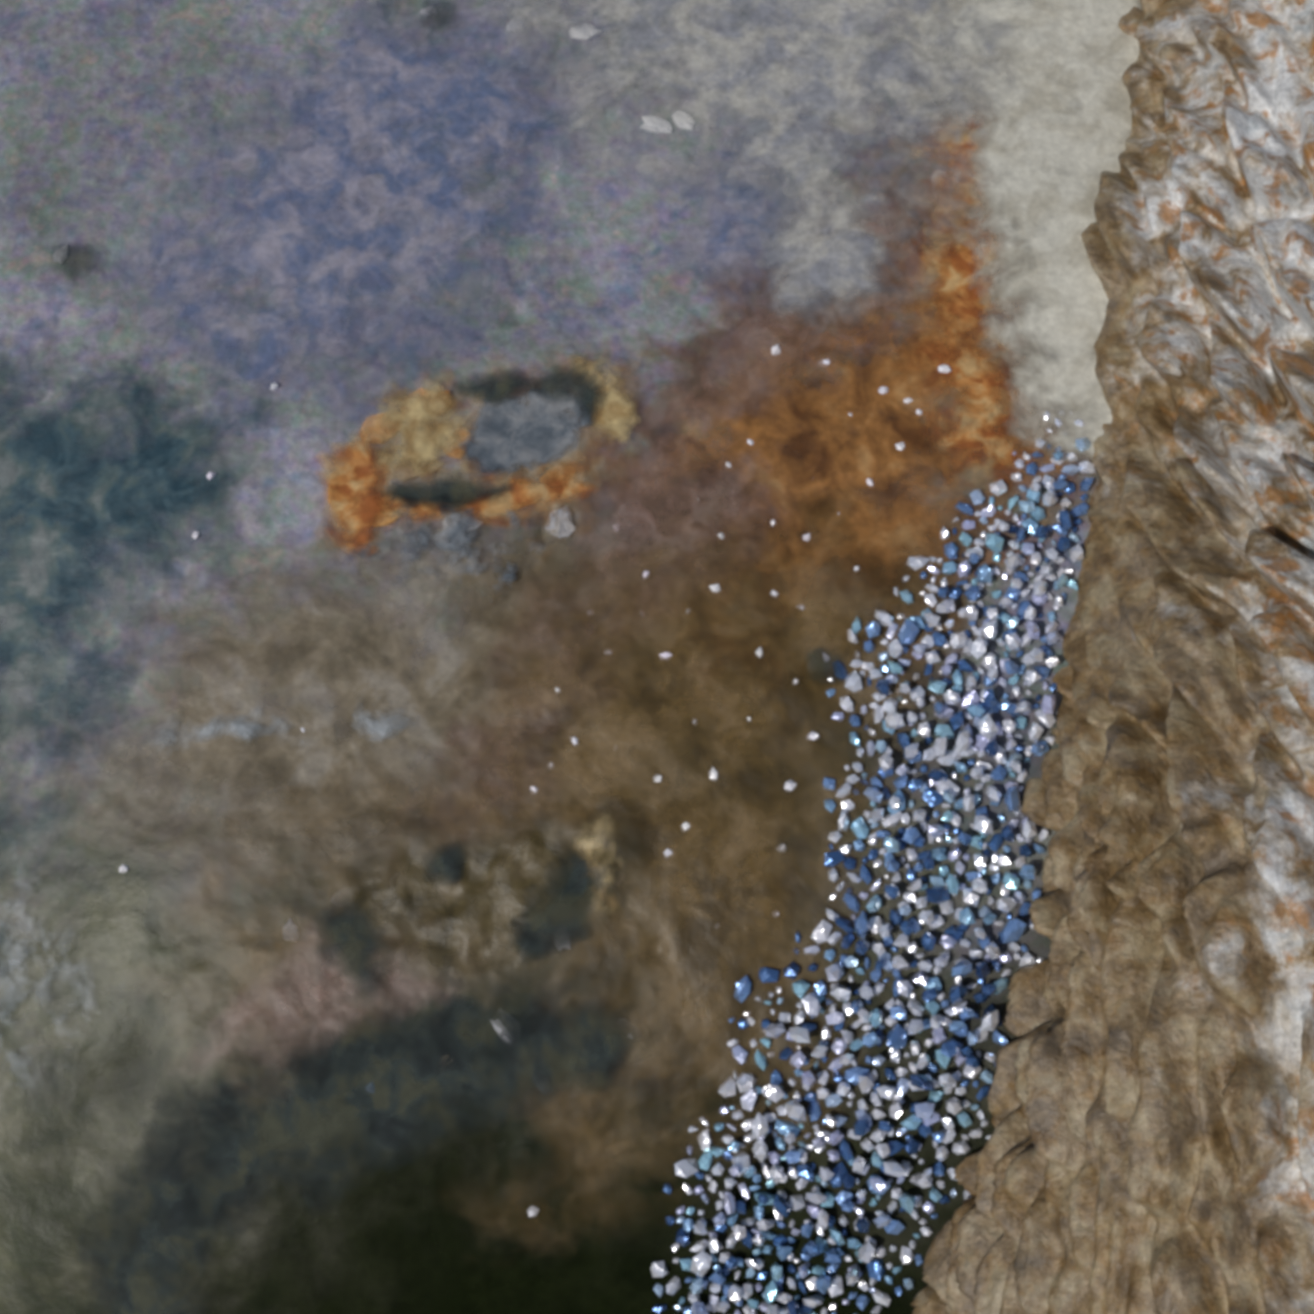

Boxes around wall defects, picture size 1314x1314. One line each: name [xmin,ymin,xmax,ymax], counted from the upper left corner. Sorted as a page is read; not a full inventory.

peeling [507,0,1142,458]
water stain [0,362,234,750]
spalling [321,358,634,573]
corrosion [430,115,1076,1067]